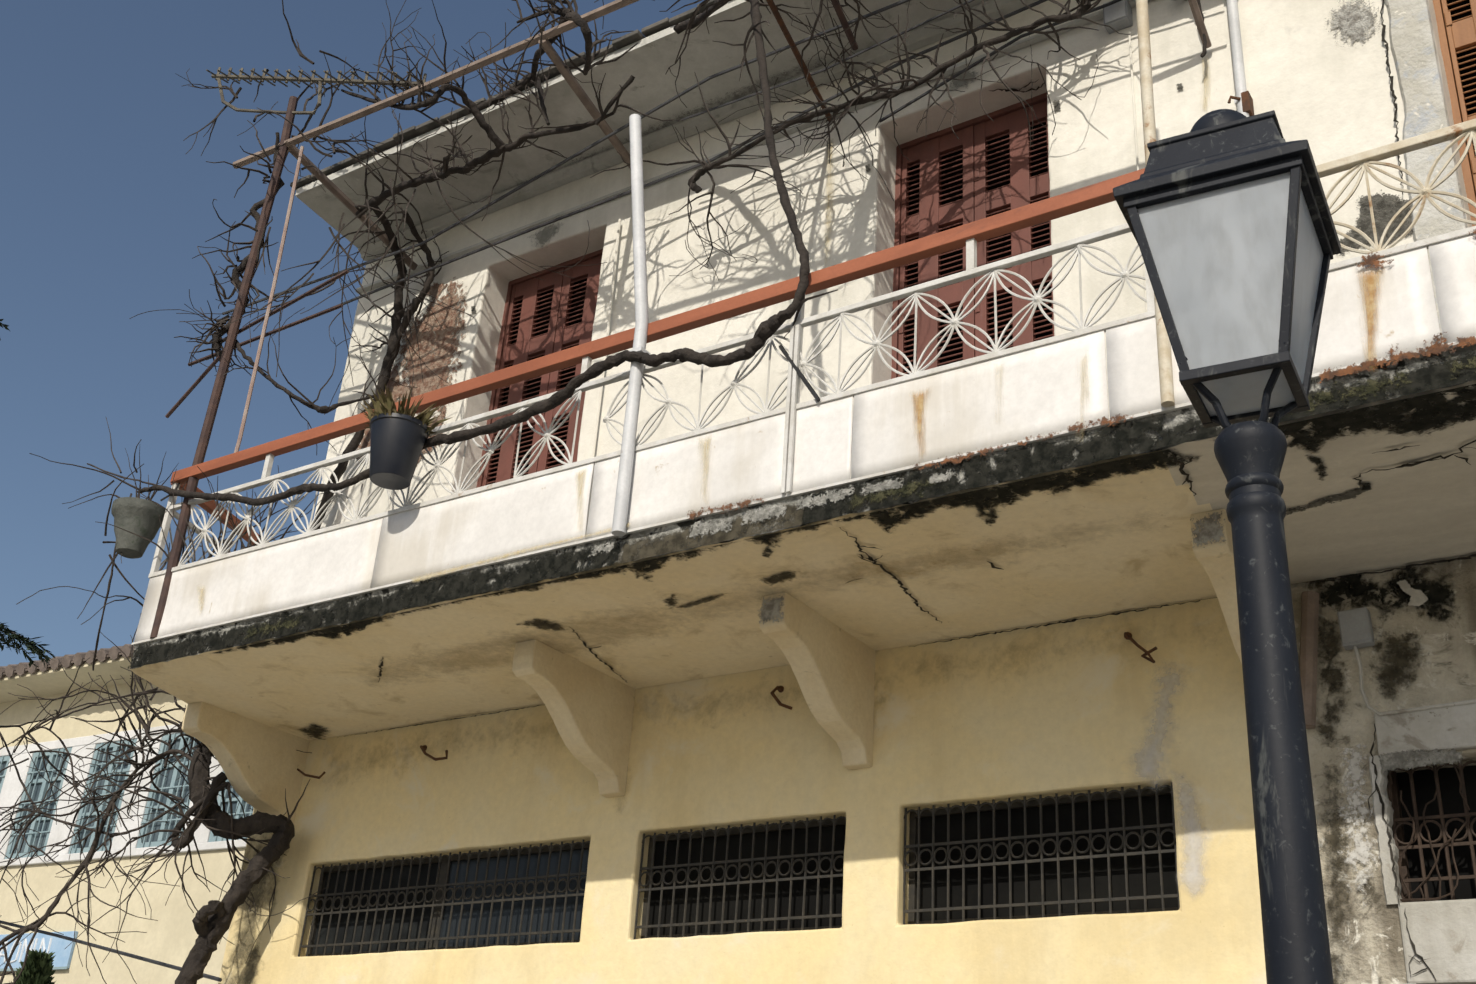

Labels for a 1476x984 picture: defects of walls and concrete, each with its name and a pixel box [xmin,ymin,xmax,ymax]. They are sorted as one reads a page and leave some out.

flaking render [1325,0,1382,45]
crack [1380,0,1403,194]
flaking render [380,281,476,462]
corrosion [1318,252,1476,384]
flaking render [356,428,371,461]
damp [128,352,1476,669]
crack [1353,440,1476,485]
crack [840,528,1217,647]
damp [1318,566,1460,746]
damp [229,841,281,984]